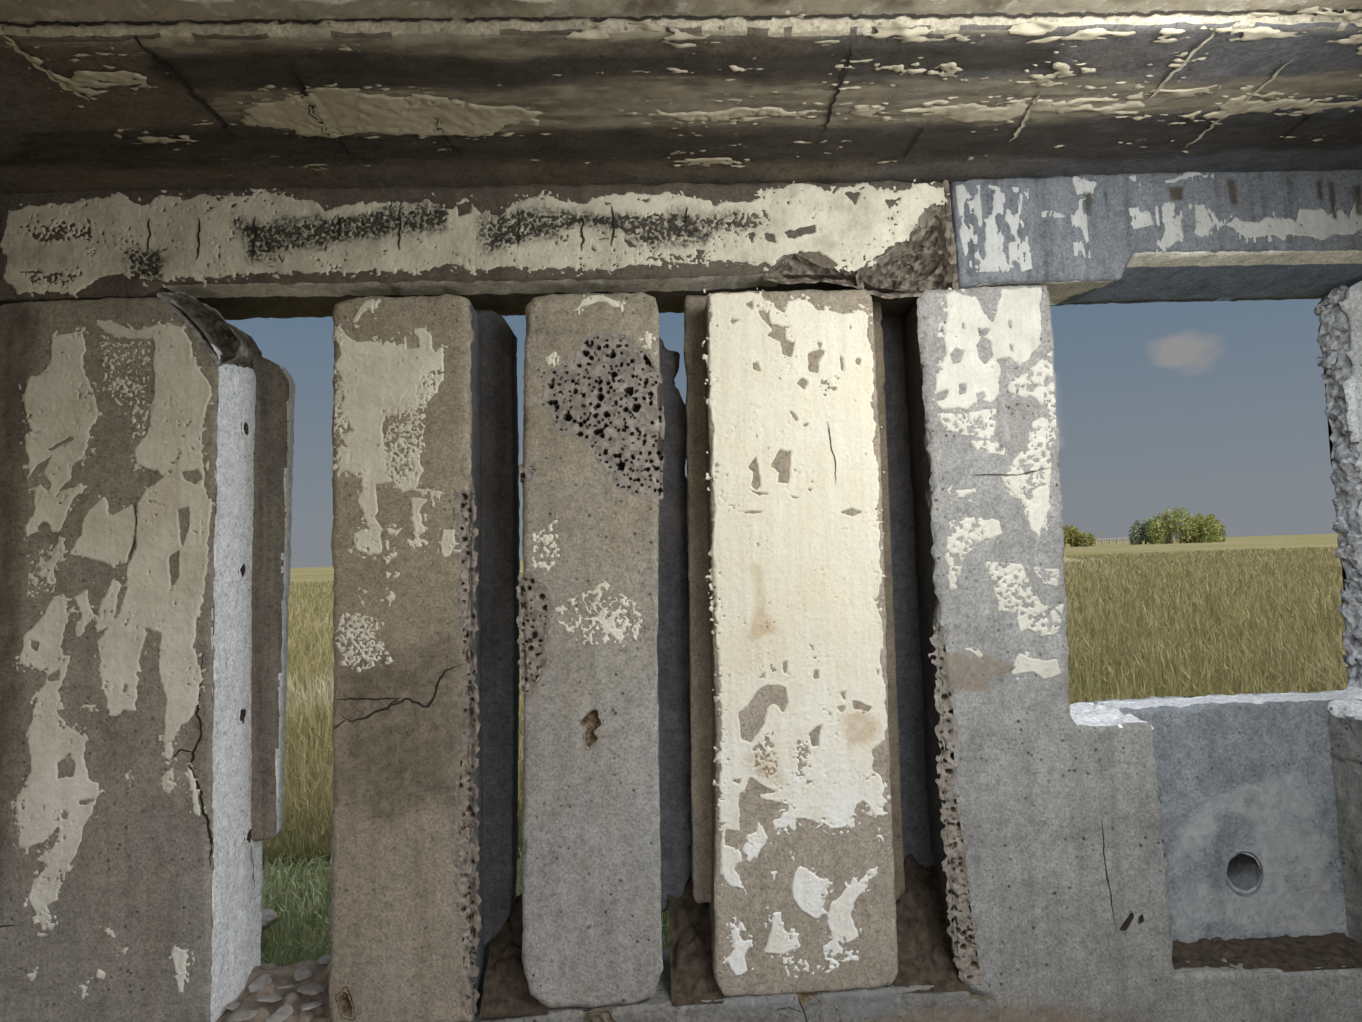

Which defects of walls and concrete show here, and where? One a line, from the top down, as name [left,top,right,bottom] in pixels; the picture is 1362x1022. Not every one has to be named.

peeling [28,33,169,108]
peeling [114,120,213,151]
peeling [229,83,559,151]
crack [0,9,1362,159]
peeling [616,6,1362,168]
leakage [127,218,163,279]
leakage [233,202,446,261]
leakage [478,207,745,249]
peeling [1041,176,1097,258]
peeling [1129,202,1362,253]
peeling [0,179,1064,1022]
crack [334,663,465,729]